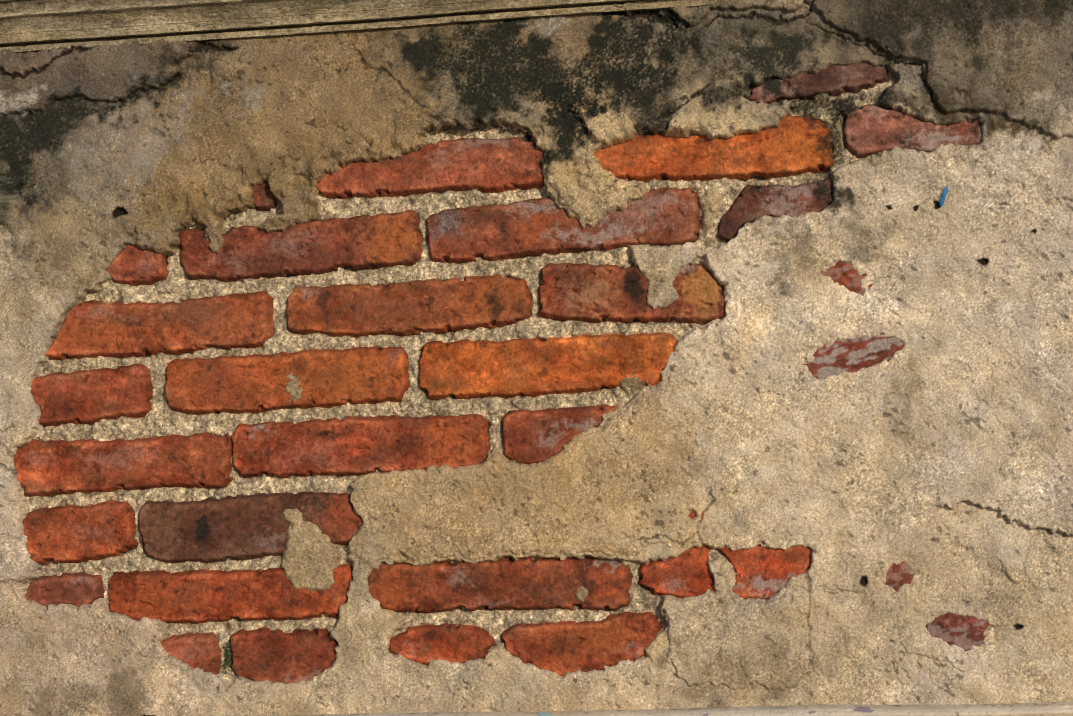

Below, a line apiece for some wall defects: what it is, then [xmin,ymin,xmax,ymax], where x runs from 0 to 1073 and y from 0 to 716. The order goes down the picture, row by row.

crack [0,47,92,79]
damp [0,48,187,205]
damp [192,40,236,59]
damp [402,9,702,165]
crack [605,10,677,26]
crack [661,84,710,118]
crack [706,0,935,103]
spalling [0,62,982,685]